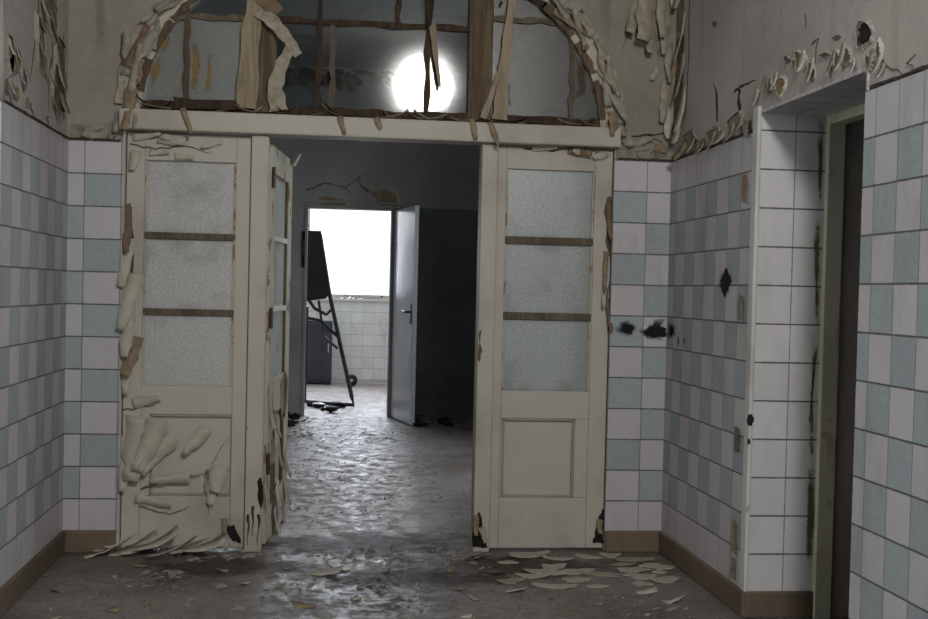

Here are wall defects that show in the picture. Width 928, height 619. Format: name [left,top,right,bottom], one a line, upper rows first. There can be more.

peeling [5,0,451,170]
peeling [524,0,902,161]
peeling [373,108,528,146]
spalling [720,268,743,321]
peeling [734,414,754,452]